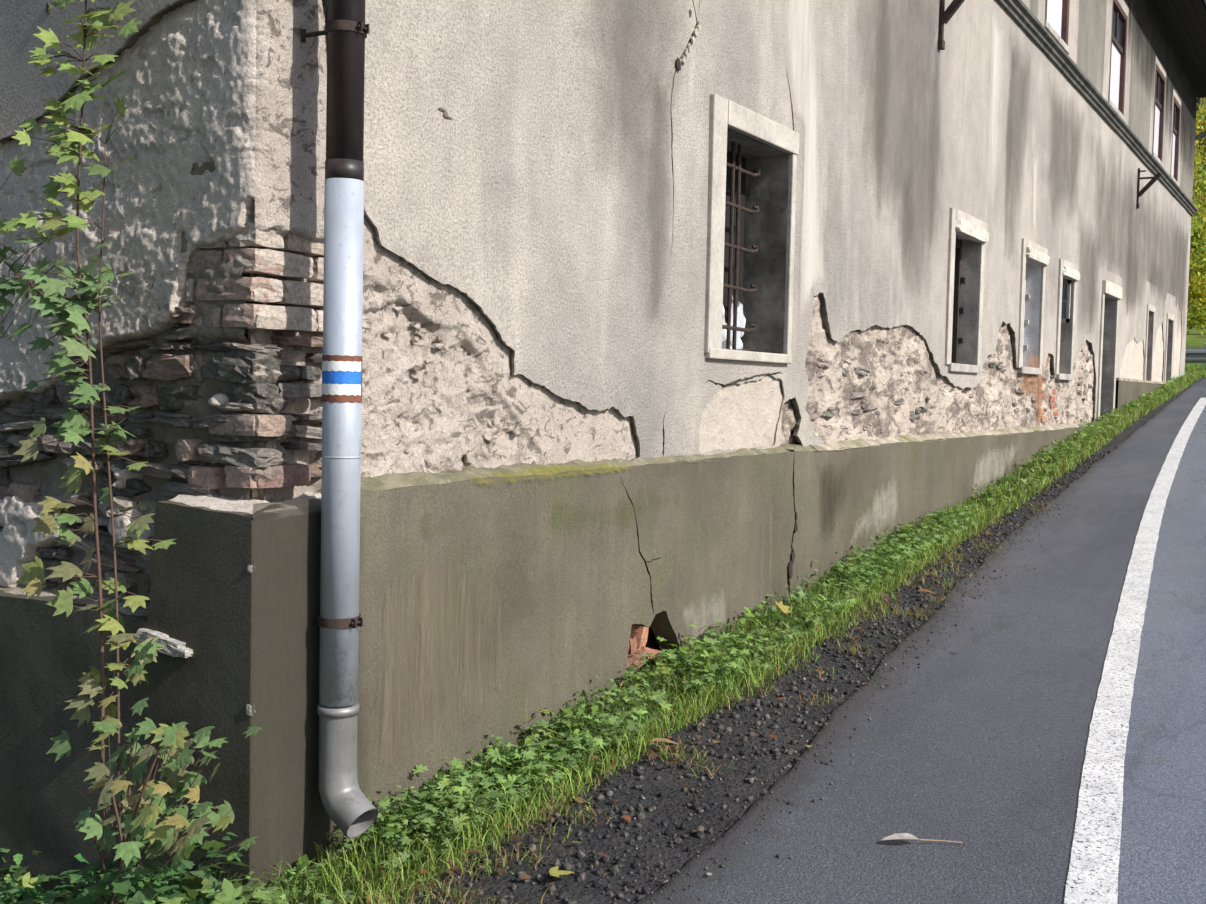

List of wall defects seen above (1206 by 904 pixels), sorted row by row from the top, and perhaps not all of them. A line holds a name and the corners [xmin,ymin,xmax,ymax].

crack [670,0,701,198]
damp [790,0,821,300]
damp [873,0,930,234]
damp [991,20,1025,189]
damp [1052,105,1079,195]
spalling [0,0,328,606]
spalling [361,211,640,478]
spalling [699,292,1096,453]
damp [1101,180,1185,307]
crack [623,485,661,614]
crack [786,449,798,598]
spalling [621,623,663,686]